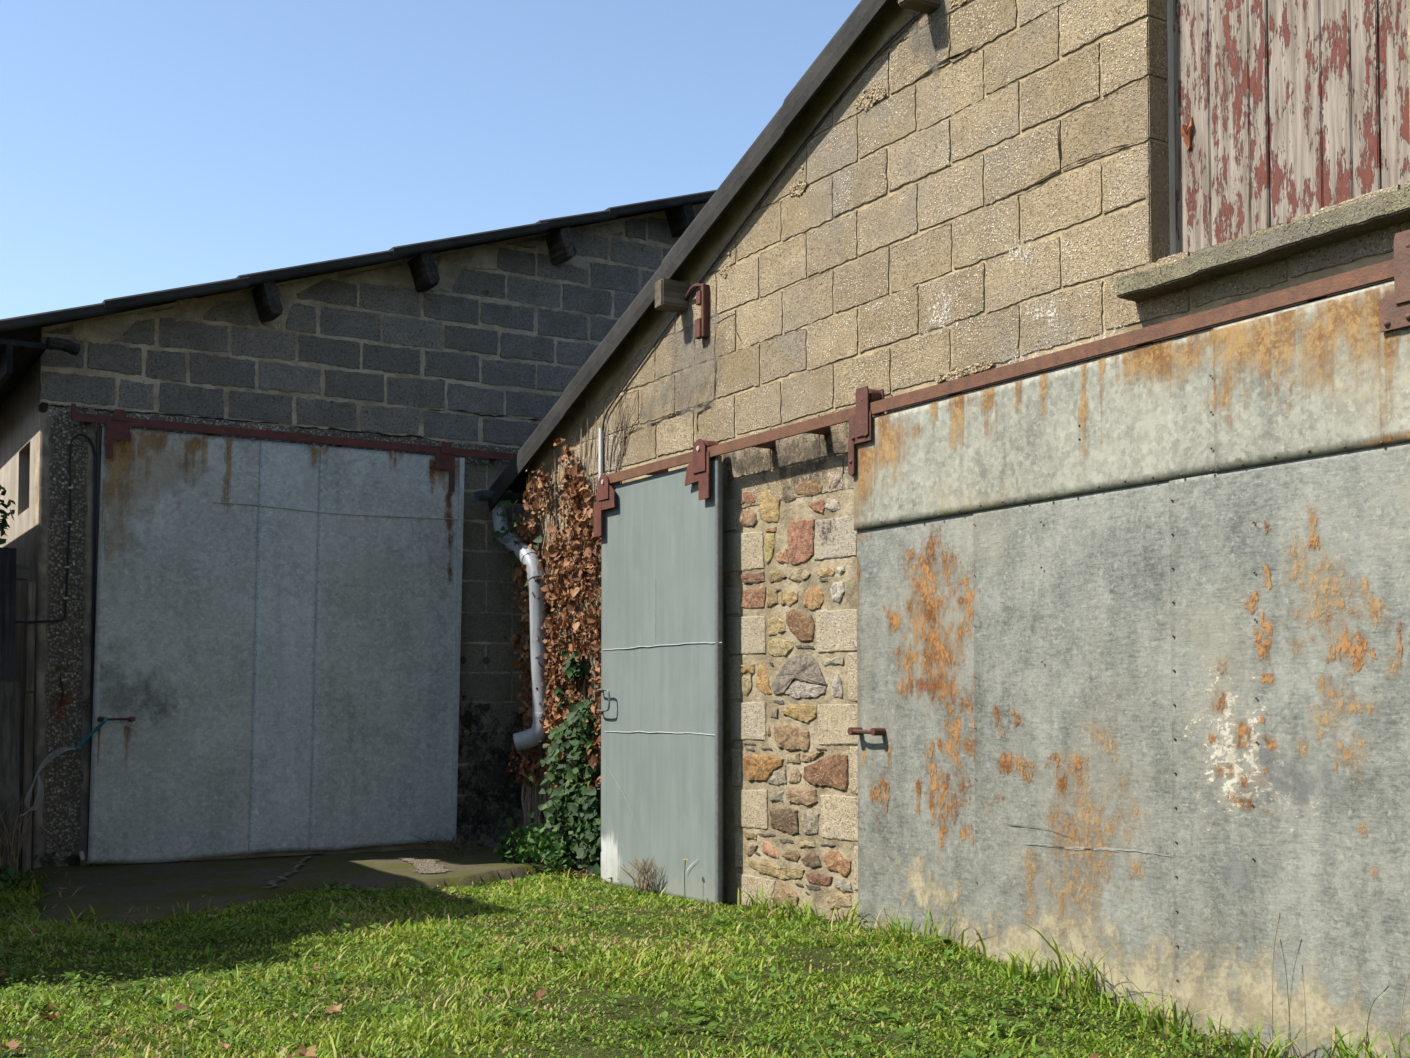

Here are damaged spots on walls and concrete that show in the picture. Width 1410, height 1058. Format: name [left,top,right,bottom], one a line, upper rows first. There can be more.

corrosion [224,439,232,501]
corrosion [429,460,459,546]
corrosion [857,394,964,497]
corrosion [1078,357,1105,431]
corrosion [1123,288,1398,424]
corrosion [1243,564,1276,684]
corrosion [1287,506,1410,772]
corrosion [870,746,890,817]
corrosion [882,524,980,859]
corrosion [994,705,1145,942]
corrosion [1217,764,1270,813]
corrosion [1235,715,1277,752]